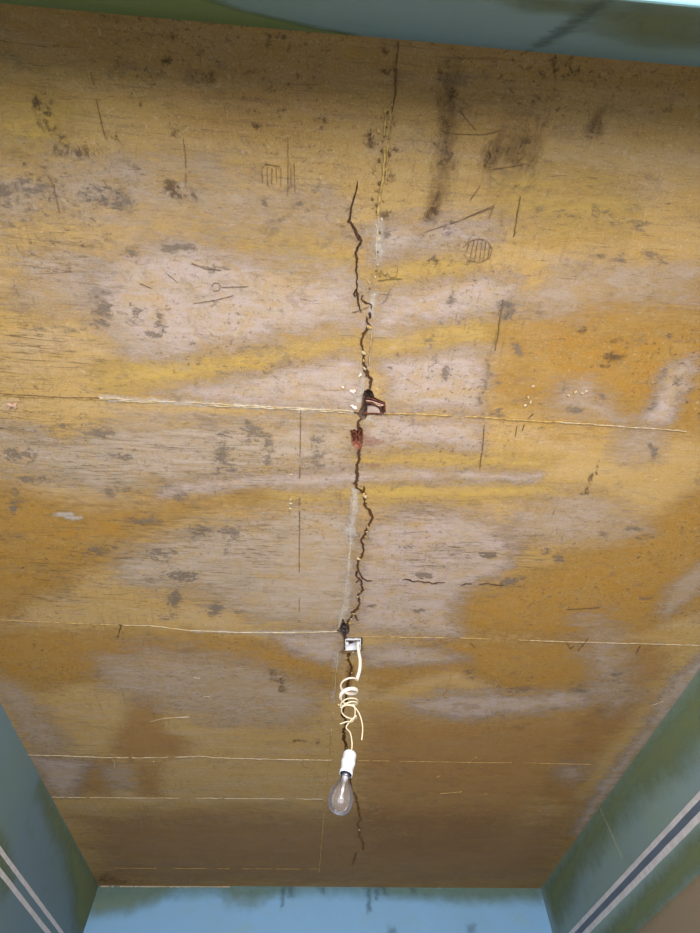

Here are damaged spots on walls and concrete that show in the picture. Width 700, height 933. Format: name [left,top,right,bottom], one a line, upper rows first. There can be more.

crack [347,181,373,390]
crack [340,412,374,751]
crack [403,578,503,586]
crack [349,779,365,866]
water stain [92,658,658,912]